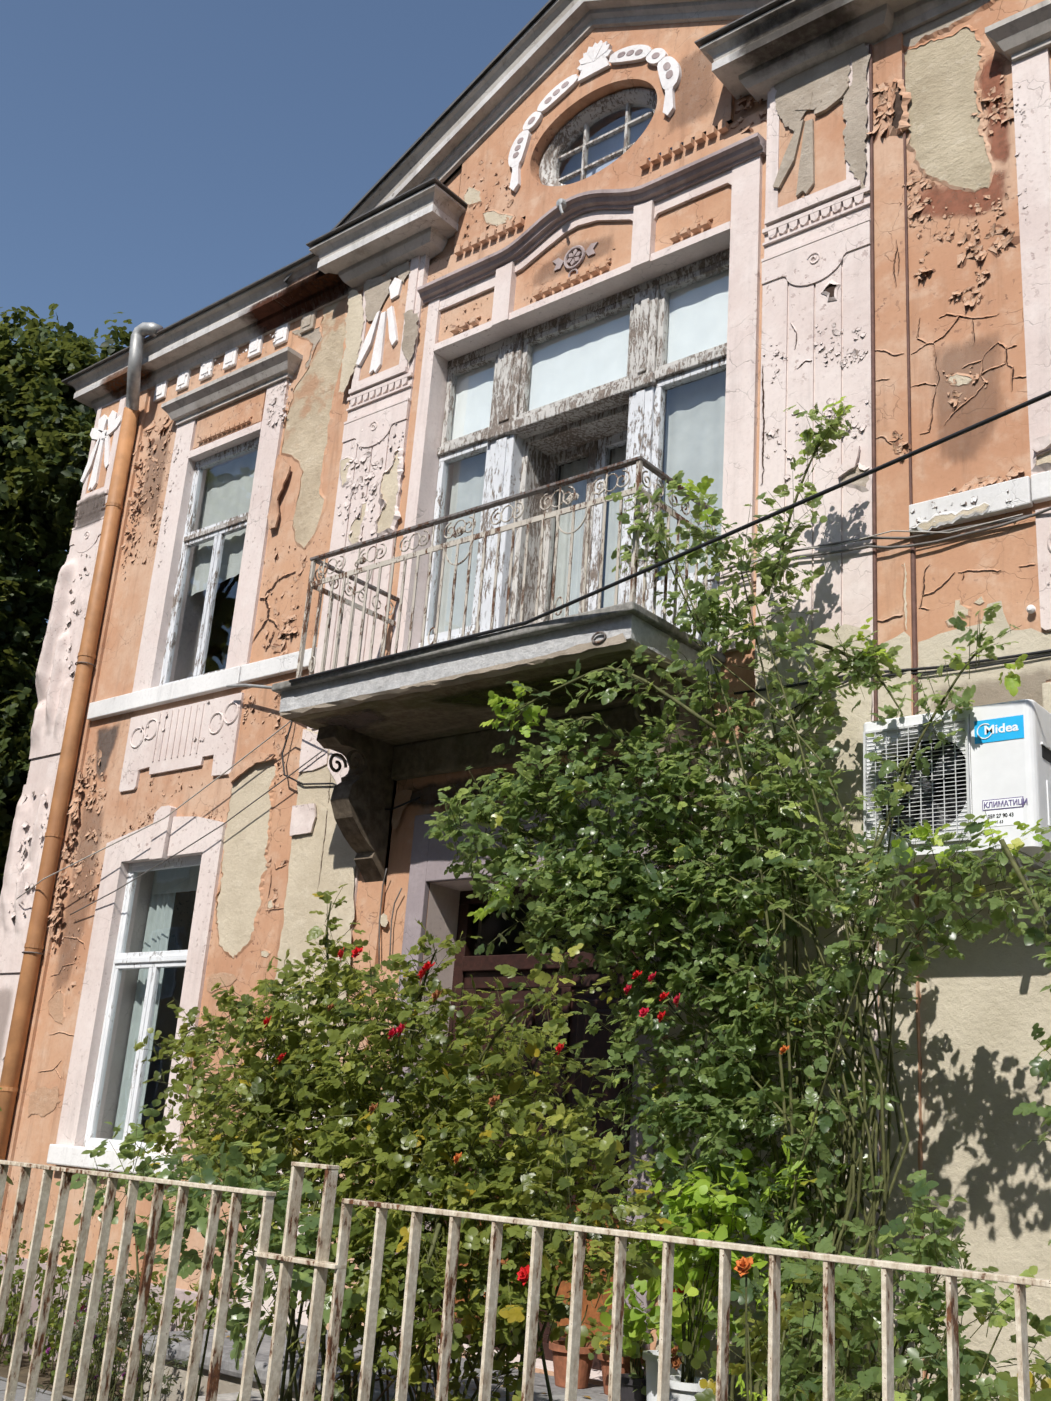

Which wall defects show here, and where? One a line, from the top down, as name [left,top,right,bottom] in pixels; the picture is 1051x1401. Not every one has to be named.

peeling [730,0,1028,310]
peeling [121,415,181,575]
crack [253,570,296,656]
peeling [178,260,410,655]
crack [875,312,1027,445]
peeling [909,431,1051,531]
peeling [48,749,203,1025]
peeling [192,693,357,1041]